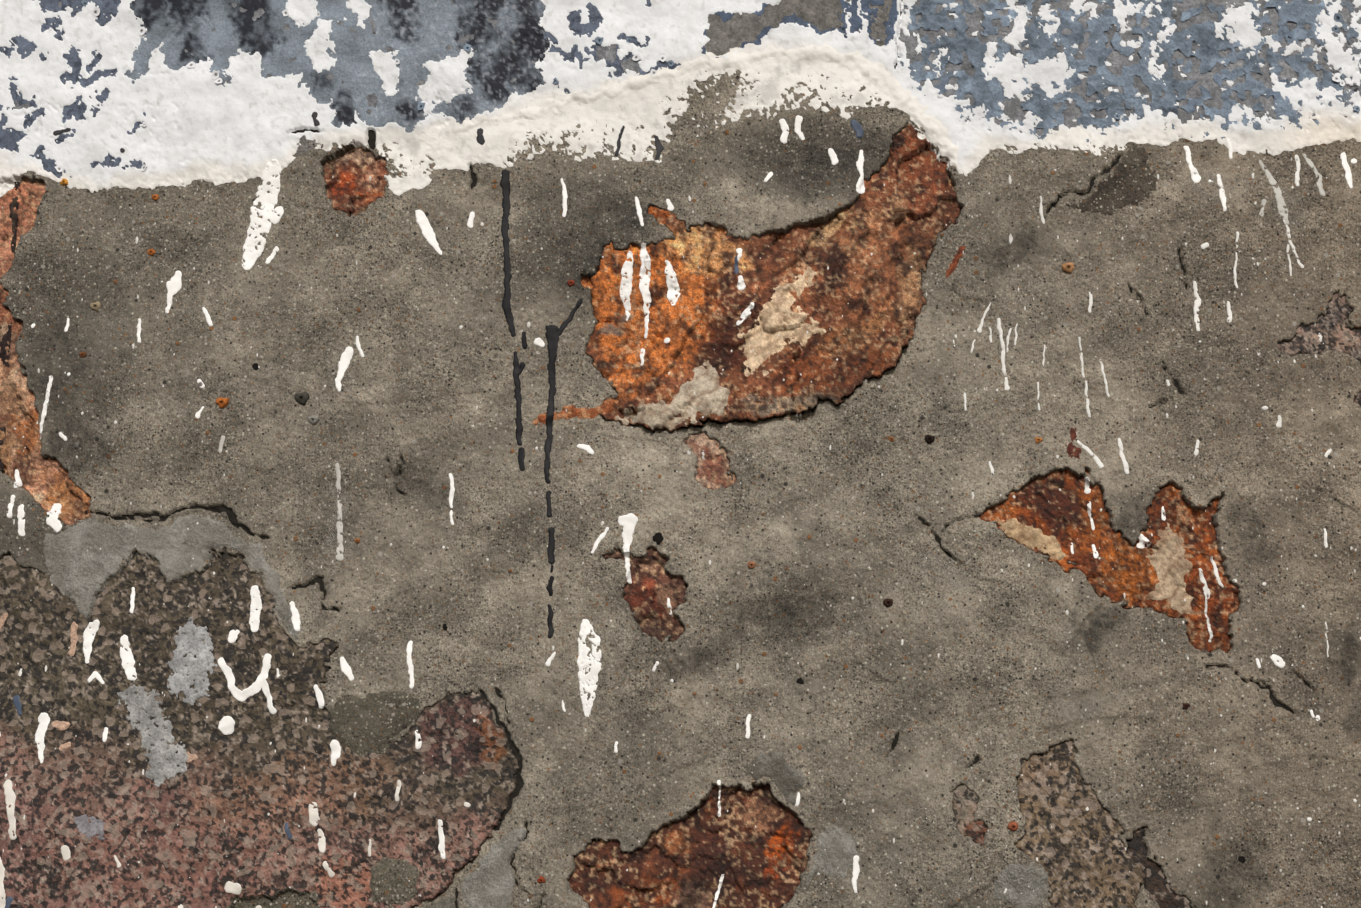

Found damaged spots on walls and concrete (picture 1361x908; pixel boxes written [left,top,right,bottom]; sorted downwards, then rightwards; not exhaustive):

peeling [701,0,1361,142]
flaking render [1277,292,1361,363]
crack [84,505,269,539]
flaking render [0,548,519,908]
flaking render [1015,740,1191,908]